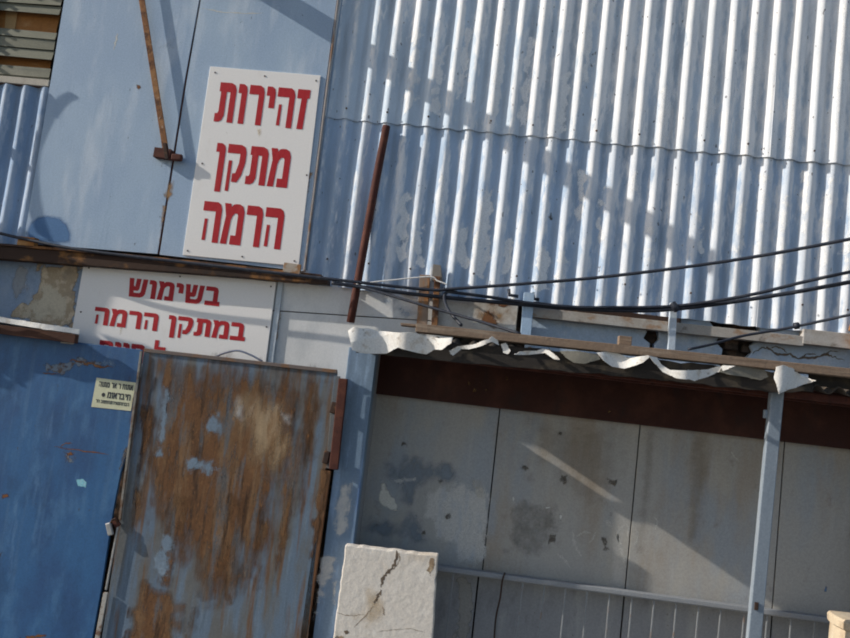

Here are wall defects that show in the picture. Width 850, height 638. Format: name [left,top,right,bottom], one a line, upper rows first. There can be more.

flaking render [11,264,83,328]
peeling [392,174,515,278]
peeling [532,241,569,293]
peeling [754,169,850,284]
peeling [44,357,111,375]
rust [123,359,317,638]
peeling [332,480,355,535]
rust [300,469,331,638]
crack [337,550,426,633]